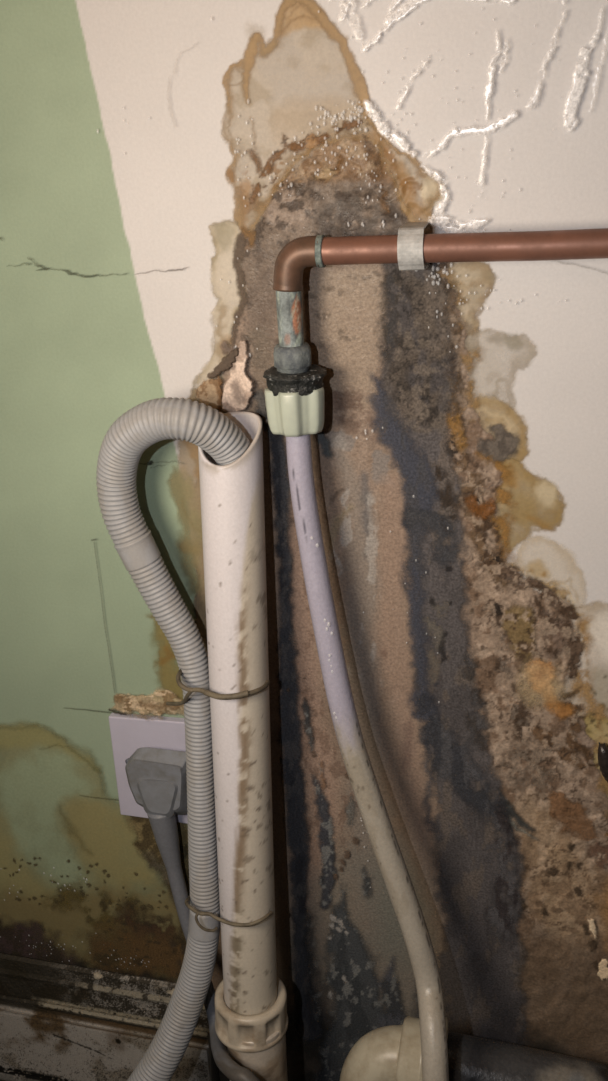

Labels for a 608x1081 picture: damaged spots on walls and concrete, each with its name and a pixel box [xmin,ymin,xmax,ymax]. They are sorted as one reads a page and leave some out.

crack [28,259,111,278]
peeling [196,133,409,413]
water stain [190,0,488,413]
water stain [430,11,565,186]
water stain [0,723,187,983]
water stain [176,822,190,896]
water stain [169,439,208,656]
peeling [211,926,223,992]
peeling [262,426,419,1081]
peeling [301,264,449,968]
water stain [370,262,608,1046]
peeling [435,262,608,1063]